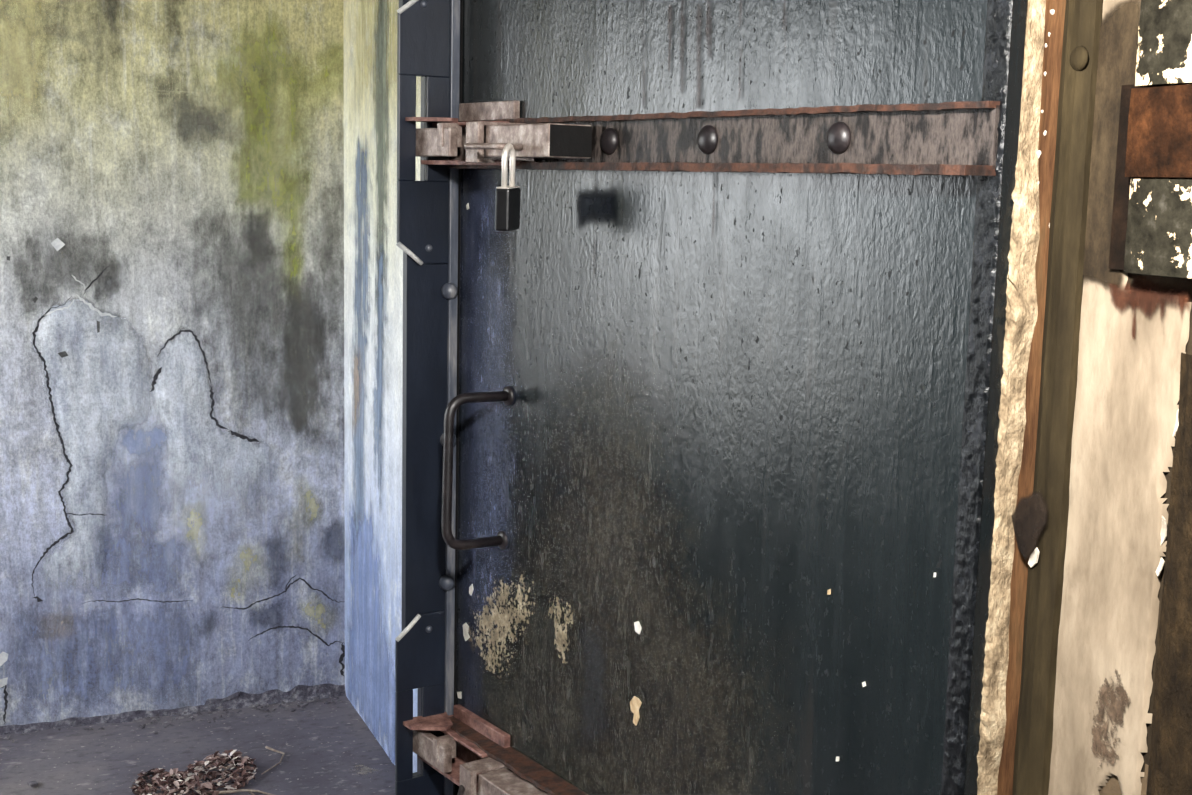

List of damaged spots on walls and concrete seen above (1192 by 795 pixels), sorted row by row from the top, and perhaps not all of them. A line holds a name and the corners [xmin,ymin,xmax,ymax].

damp [16,238,114,313]
corrosion [1110,281,1188,338]
crack [150,330,259,442]
crack [31,266,118,602]
crack [85,596,193,604]
crack [225,575,345,676]
spalling [0,652,346,735]